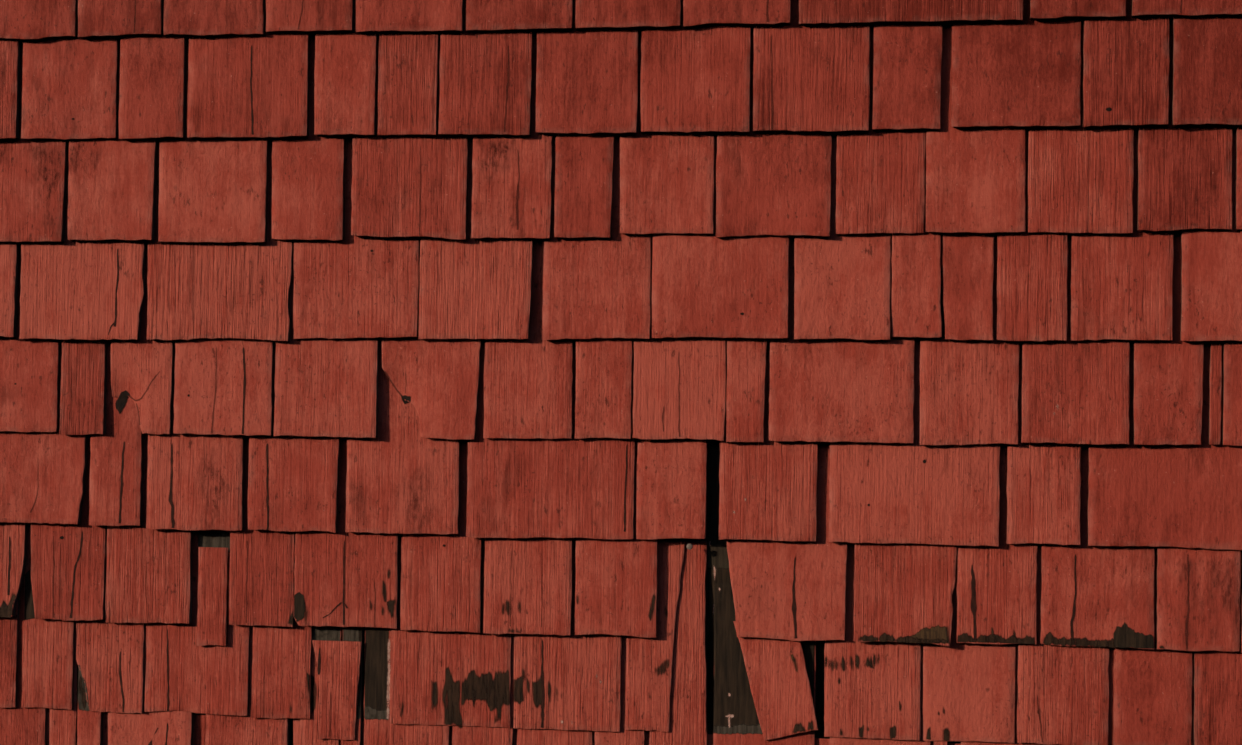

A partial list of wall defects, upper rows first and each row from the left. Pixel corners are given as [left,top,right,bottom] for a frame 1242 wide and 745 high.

crack [108,249,119,335]
crack [119,371,160,523]
crack [168,444,176,528]
peeling [0,569,35,620]
peeling [288,570,403,720]
peeling [431,667,562,728]
peeling [708,568,763,735]
peeling [926,708,950,741]
peeling [791,622,1165,733]